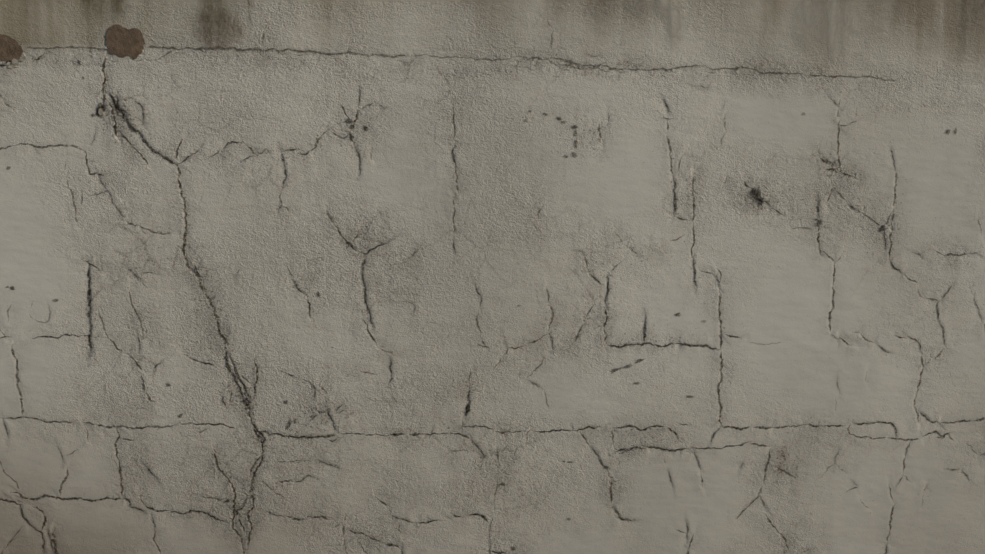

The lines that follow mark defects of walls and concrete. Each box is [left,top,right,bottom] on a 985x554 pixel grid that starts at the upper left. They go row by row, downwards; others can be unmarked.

crack [0,46,604,554]
crack [576,102,984,554]